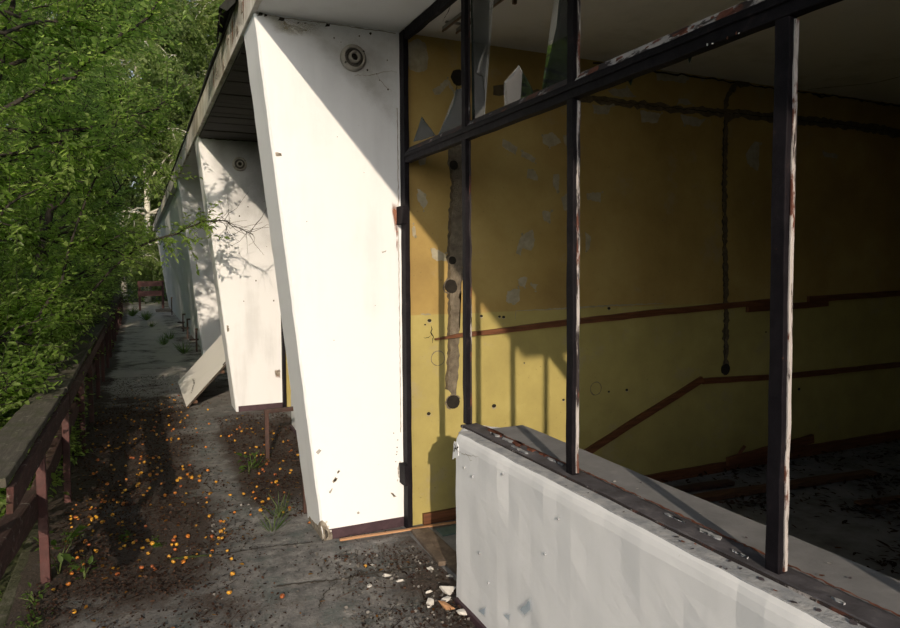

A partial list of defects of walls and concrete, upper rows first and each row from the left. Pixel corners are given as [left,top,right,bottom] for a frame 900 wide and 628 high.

corrosion [485,426,566,464]